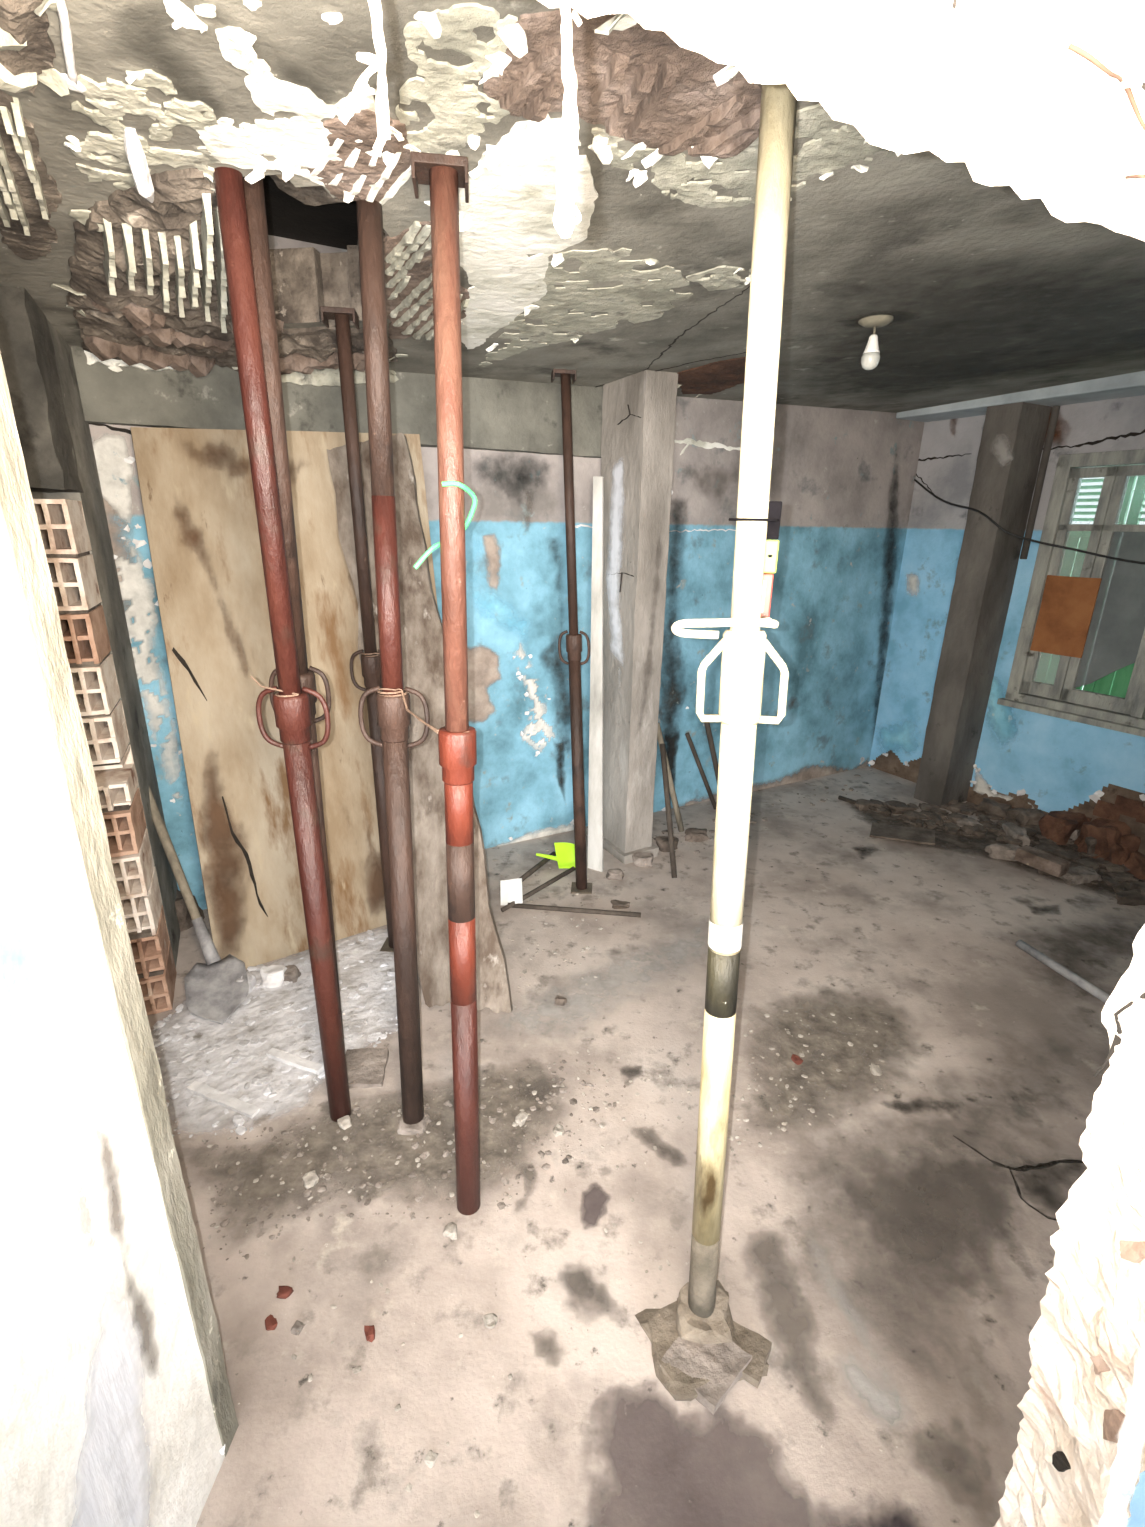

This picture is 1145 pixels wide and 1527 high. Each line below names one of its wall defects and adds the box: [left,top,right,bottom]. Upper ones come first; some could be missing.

peeling [0,0,376,203]
peeling [68,209,104,232]
spalling [355,3,762,367]
peeling [790,103,901,201]
peeling [50,284,86,317]
water stain [493,461,540,493]
peeling [93,436,182,803]
peeling [467,535,554,756]
flaking render [966,764,1145,855]
crack [953,1135,1084,1221]
water stain [595,1390,911,1527]
water stain [921,1443,975,1492]